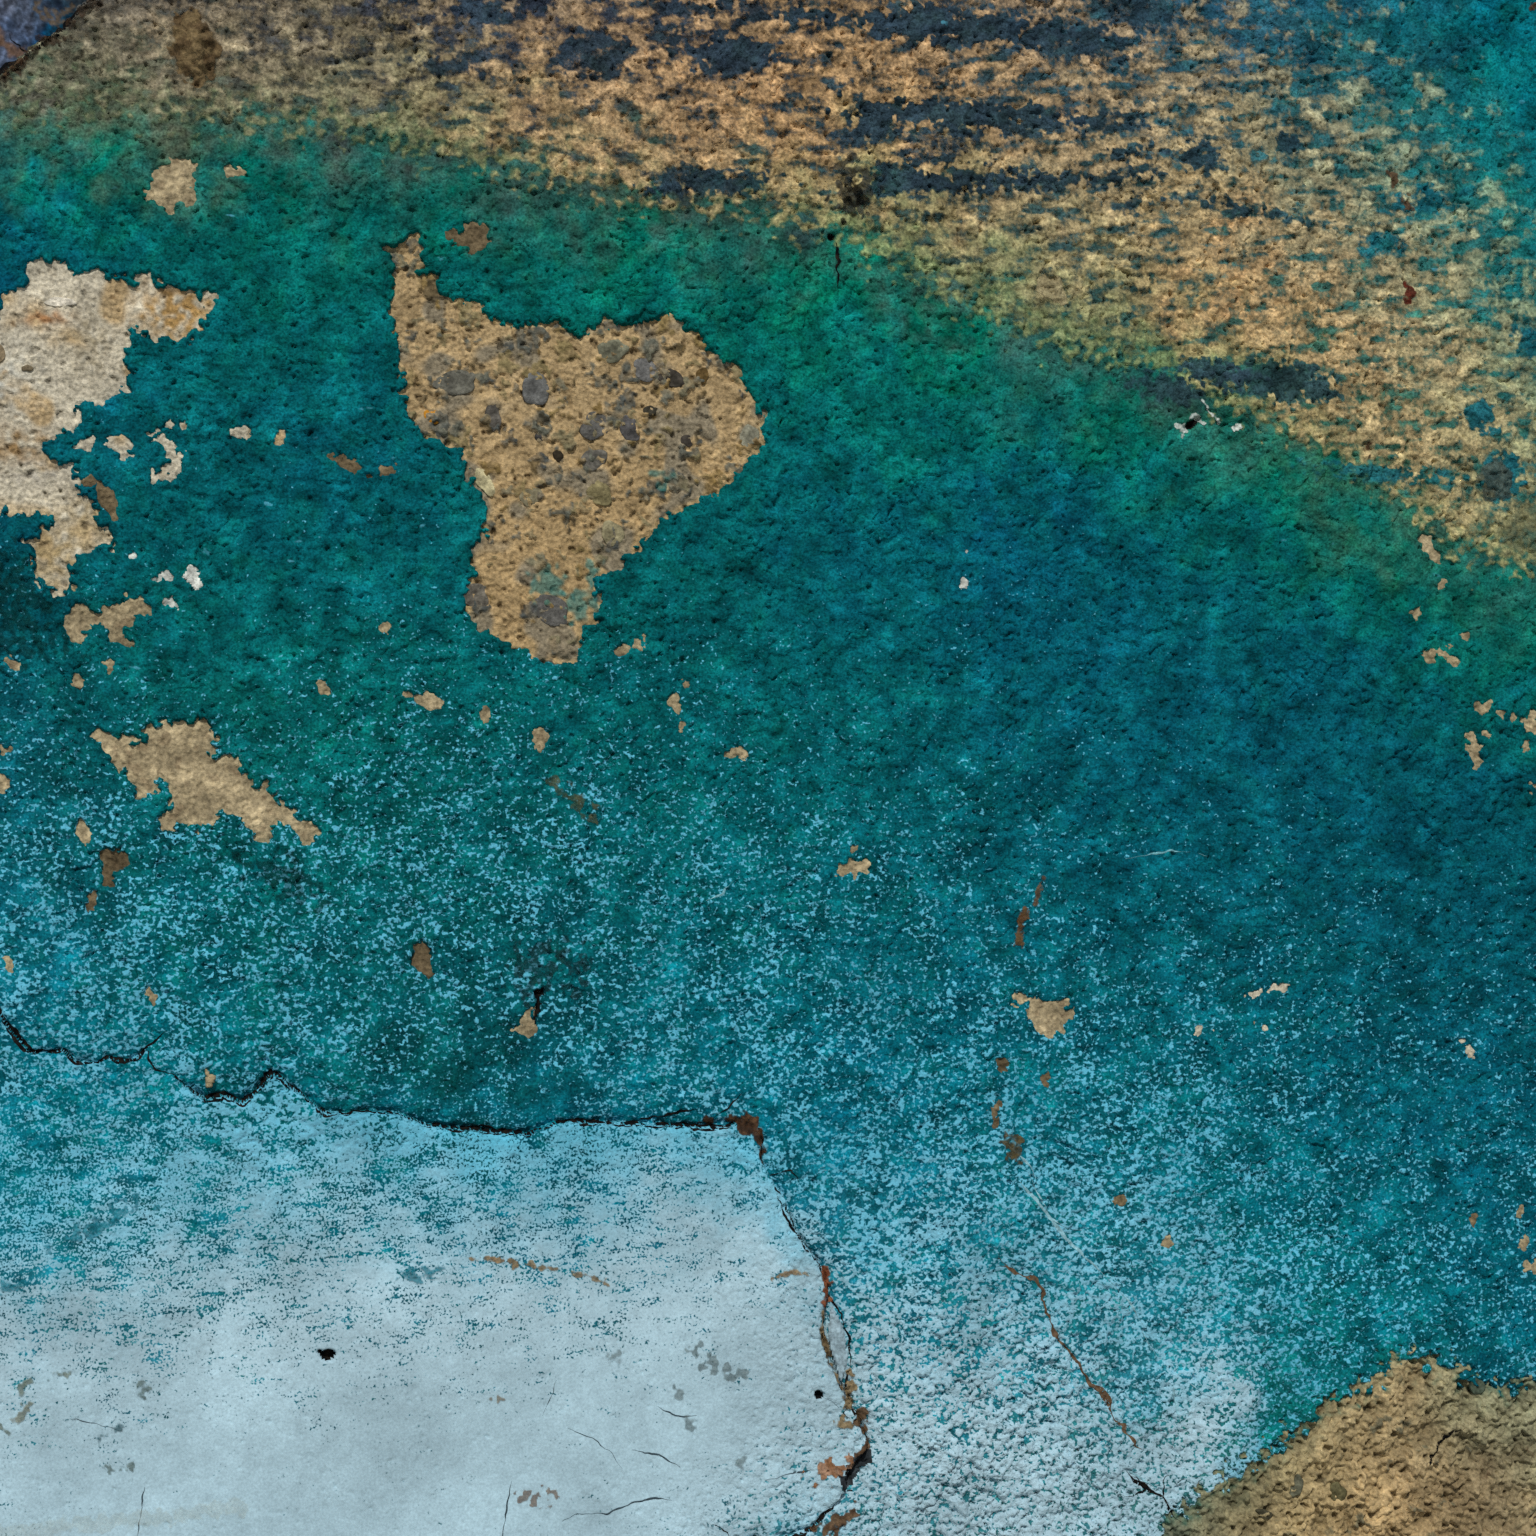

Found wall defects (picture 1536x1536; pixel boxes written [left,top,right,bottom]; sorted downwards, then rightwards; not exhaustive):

peeling [0,0,1536,590]
spalling [0,257,219,674]
spalling [382,232,768,664]
peeling [71,673,84,689]
spalling [90,718,321,845]
peeling [316,680,331,695]
peeling [667,679,689,733]
peeling [1422,632,1470,667]
peeling [1464,699,1536,771]
crack [0,1008,867,1536]
spalling [838,1449,872,1492]
spalling [1162,1343,1536,1536]